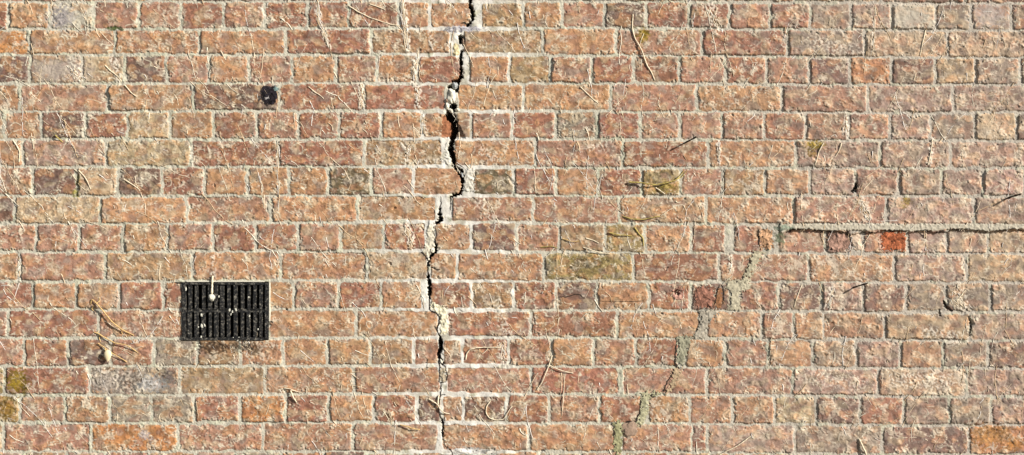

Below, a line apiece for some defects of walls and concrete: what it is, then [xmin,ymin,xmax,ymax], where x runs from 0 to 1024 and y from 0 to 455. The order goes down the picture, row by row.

crack [421,0,475,455]
crack [612,230,766,455]